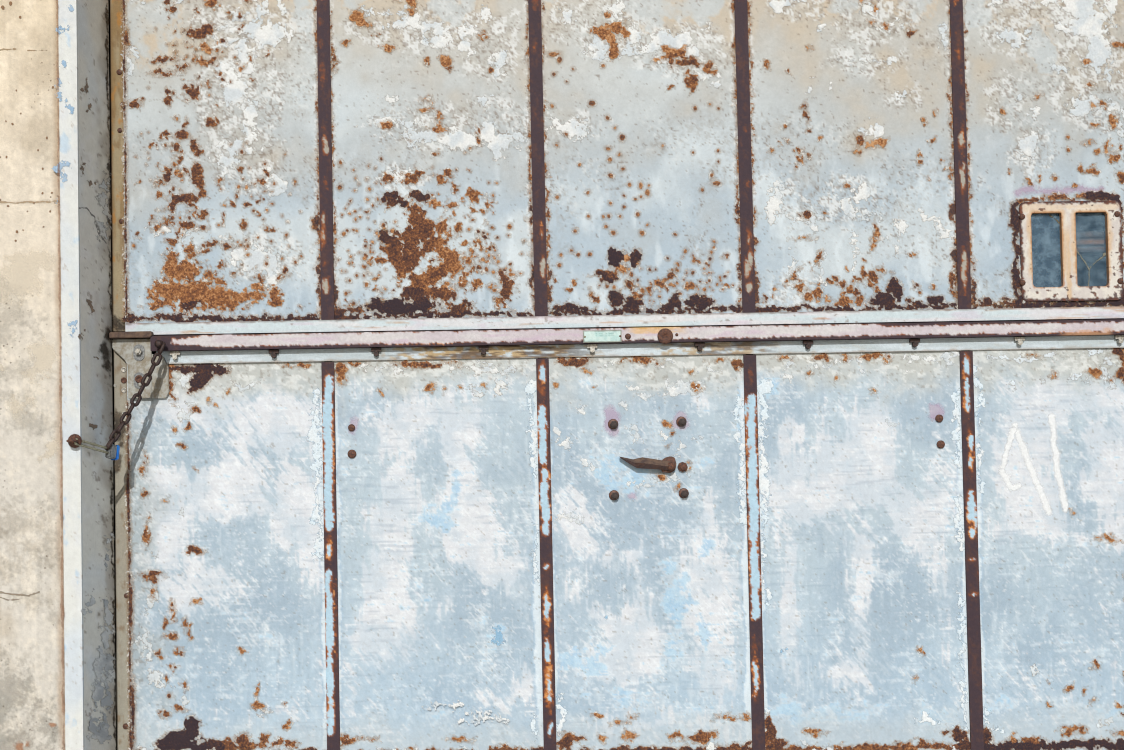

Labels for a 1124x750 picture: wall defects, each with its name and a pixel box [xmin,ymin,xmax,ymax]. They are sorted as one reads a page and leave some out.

peeling [207,0,294,198]
peeling [360,4,509,82]
peeling [355,94,530,162]
corrosion [120,0,1124,323]
peeling [582,0,722,88]
peeling [1018,0,1124,137]
peeling [144,226,285,290]
corrosion [168,363,231,450]
corrosion [394,359,463,393]
corrosion [805,352,892,378]
corrosion [1084,348,1124,383]
corrosion [340,711,1124,750]